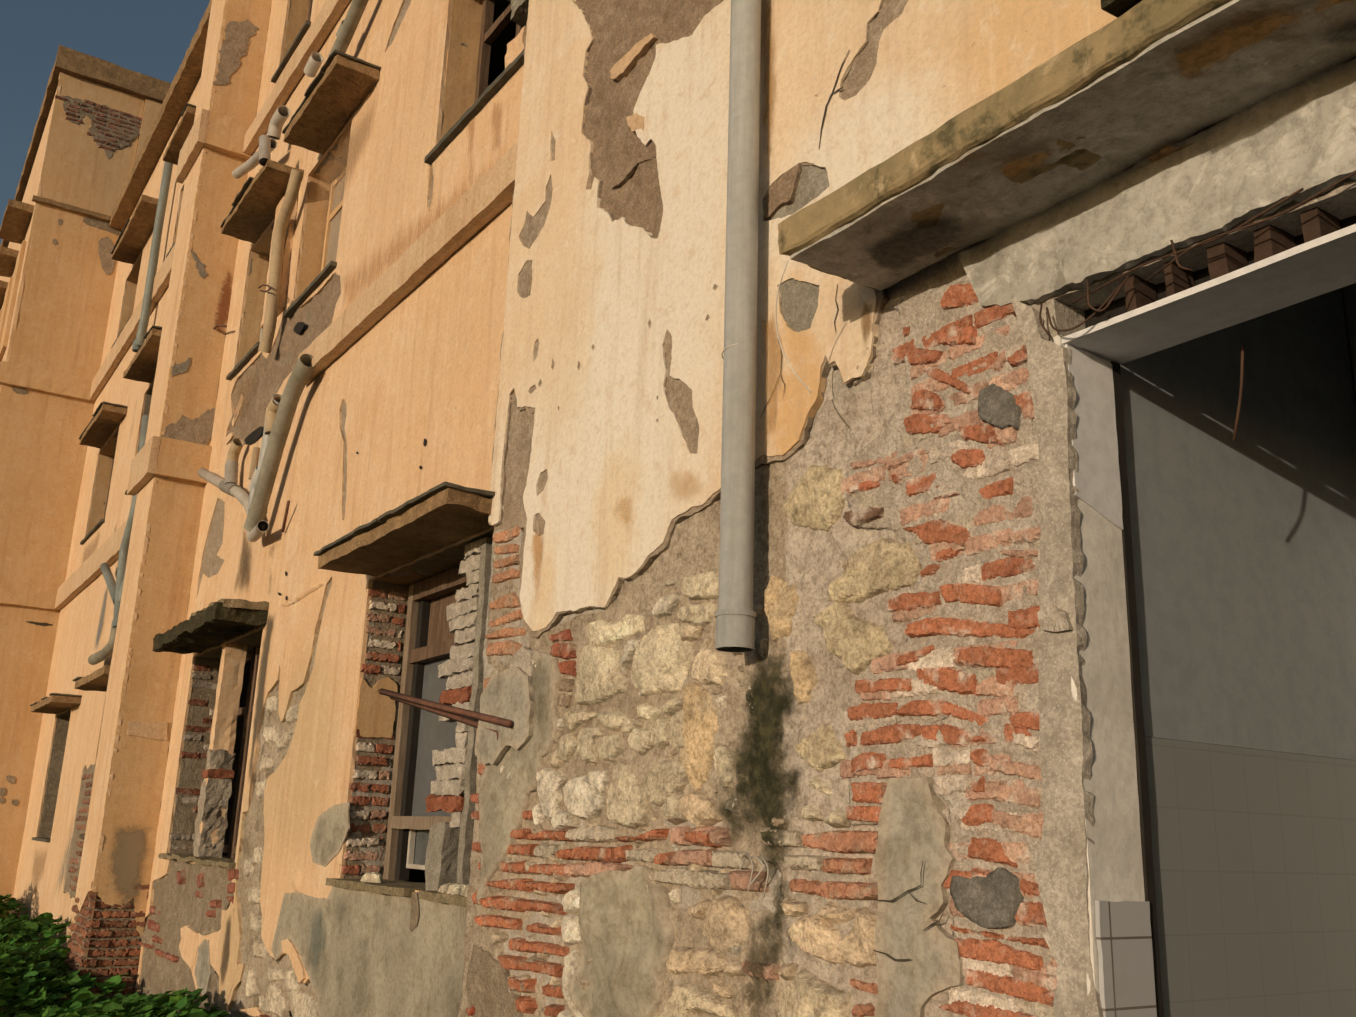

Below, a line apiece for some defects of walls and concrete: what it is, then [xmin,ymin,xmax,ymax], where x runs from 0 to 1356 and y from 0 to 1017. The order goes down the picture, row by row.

peeling [213,19,259,85]
peeling [840,0,909,101]
flaking render [55,95,142,159]
peeling [575,0,724,239]
peeling [779,278,819,332]
peeling [161,272,341,469]
peeling [341,401,358,517]
peeling [198,499,225,591]
flaking render [458,302,1073,1017]
flaking render [60,580,332,1017]
damp [719,654,798,1004]